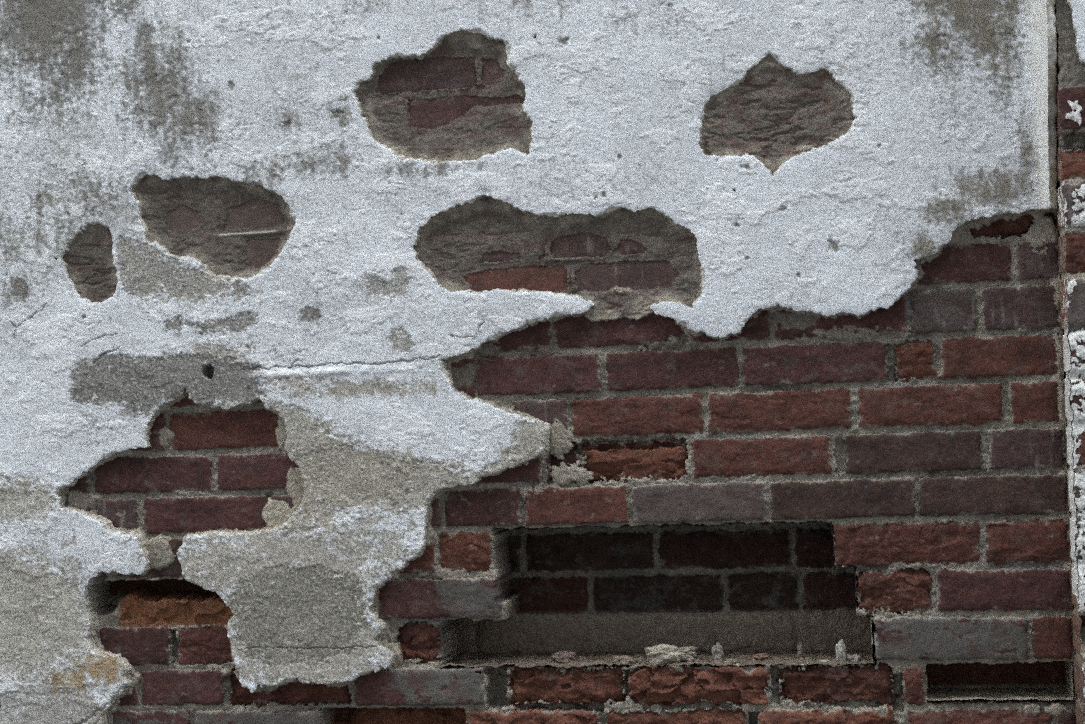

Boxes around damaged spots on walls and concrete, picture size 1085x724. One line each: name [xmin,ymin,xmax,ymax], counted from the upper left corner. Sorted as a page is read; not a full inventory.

spalling [354,29,533,162]
spalling [699,54,856,176]
leakage [911,0,1023,105]
peeling [1056,0,1085,87]
peeling [1065,100,1082,125]
leakage [926,129,1034,223]
crack [242,320,486,371]
spalling [0,174,1085,724]